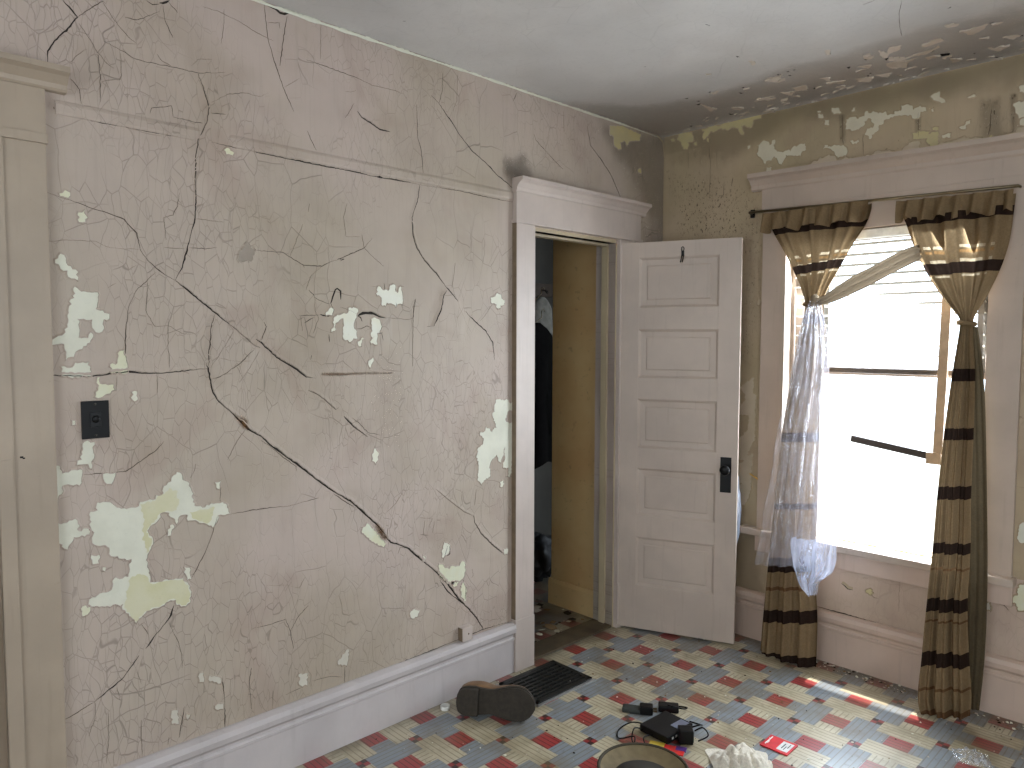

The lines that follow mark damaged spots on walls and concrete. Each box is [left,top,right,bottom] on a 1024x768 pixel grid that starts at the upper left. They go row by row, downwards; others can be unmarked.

peeling [252,0,657,151]
peeling [670,22,1024,172]
peeling [52,252,130,400]
crack [47,0,512,661]
peeling [324,283,404,369]
peeling [475,397,512,488]
peeling [59,471,231,625]
peeling [360,522,387,548]
peeling [422,541,468,602]
crack [66,606,183,763]